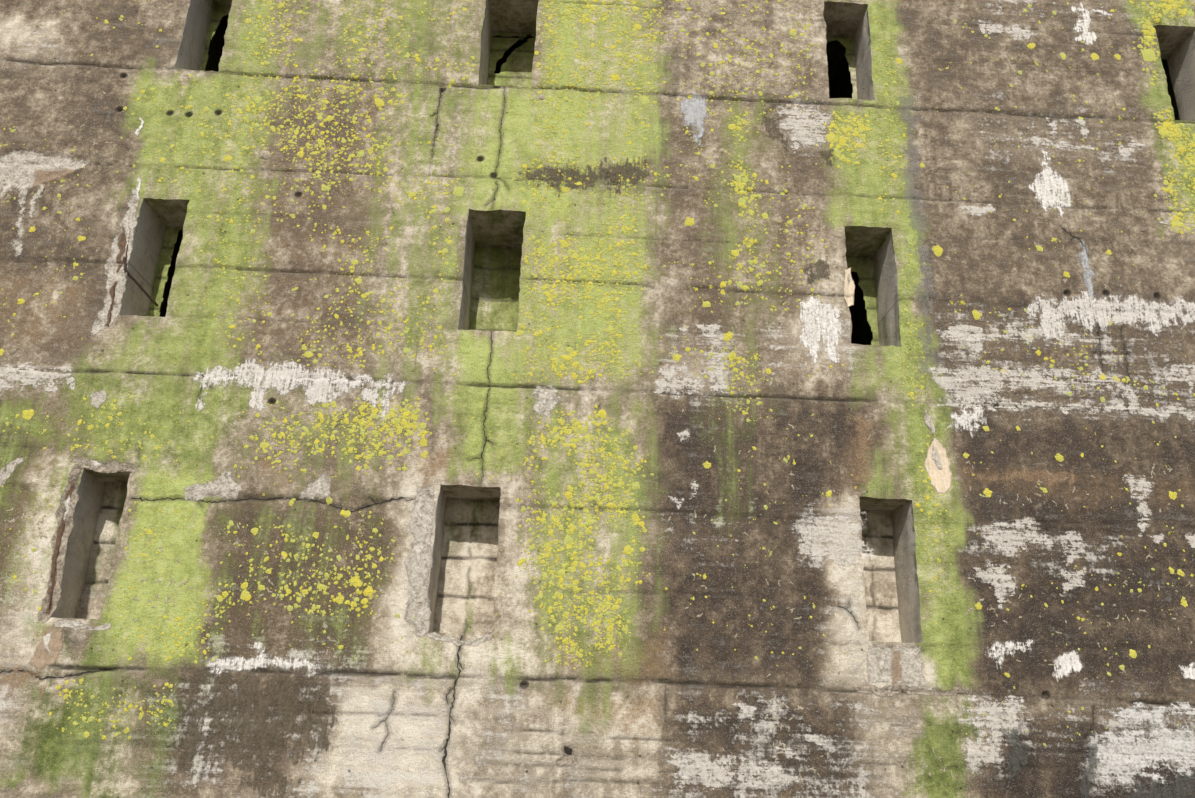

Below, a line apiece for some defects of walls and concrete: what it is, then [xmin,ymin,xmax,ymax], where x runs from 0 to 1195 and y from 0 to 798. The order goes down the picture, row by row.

spalling [0,150,90,257]
crack [489,87,507,209]
damp [519,157,649,197]
peeling [924,409,952,493]
crack [131,497,412,512]
crack [0,667,117,680]
crack [442,636,464,798]